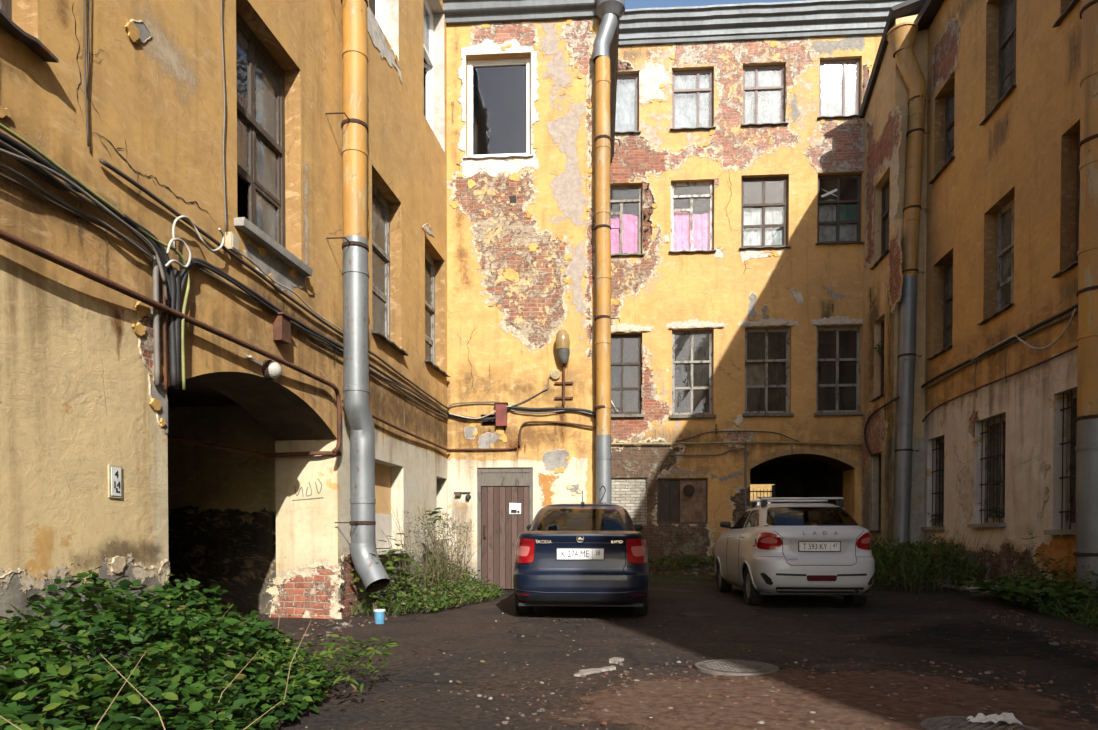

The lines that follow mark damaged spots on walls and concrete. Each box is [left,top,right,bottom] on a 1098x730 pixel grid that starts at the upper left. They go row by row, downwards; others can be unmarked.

crack [72,3,220,226]
spalling [367,6,402,83]
flaking render [931,11,962,92]
flaking render [447,18,598,359]
flaking render [610,37,903,333]
spalling [538,449,582,507]
flaking render [611,345,716,565]
flaking render [727,484,750,527]
flaking render [723,414,757,451]
flaking render [861,399,889,533]
flaking render [0,553,170,705]
flaking render [266,546,367,619]